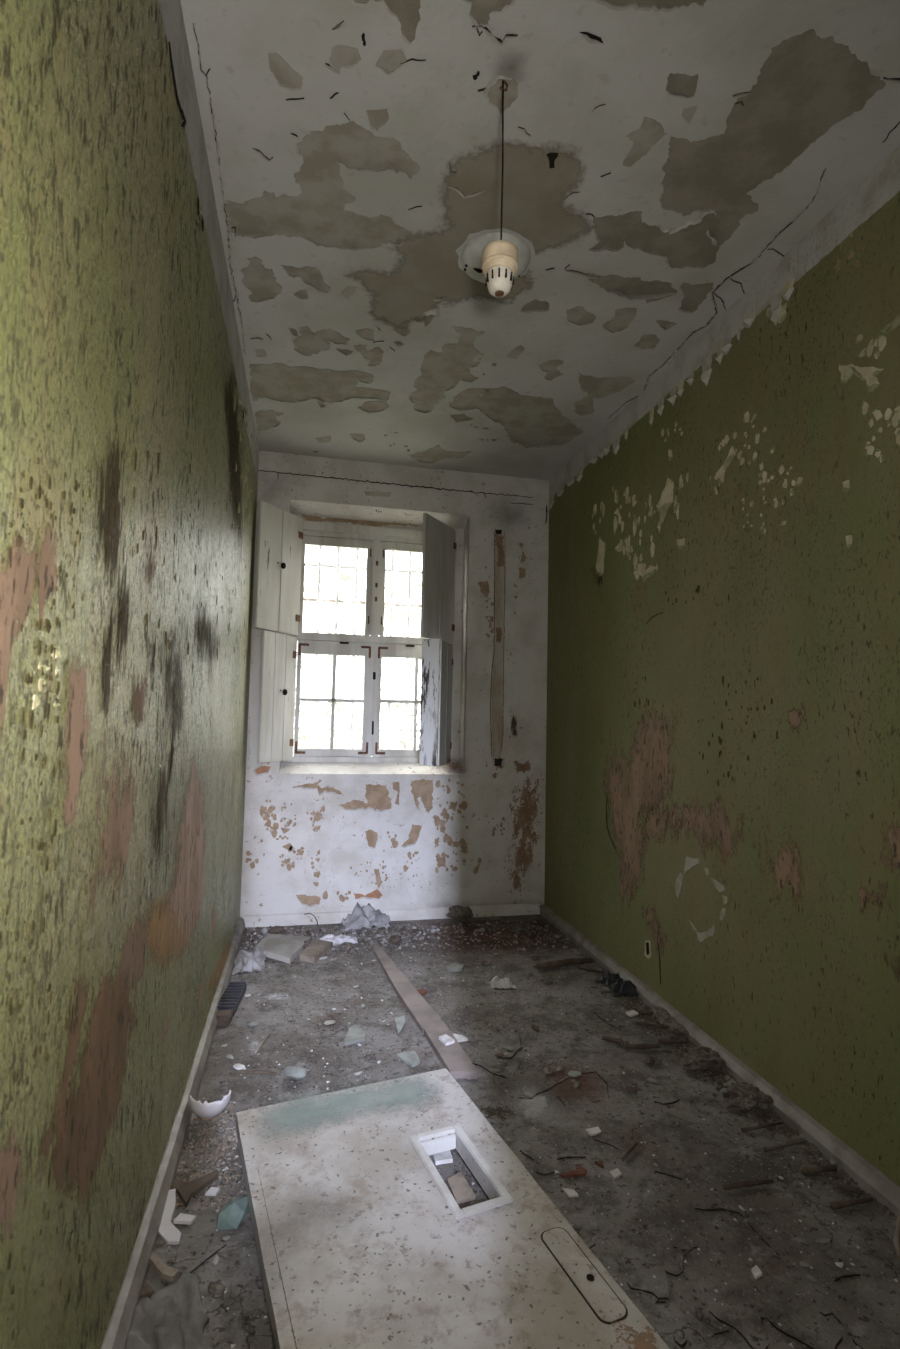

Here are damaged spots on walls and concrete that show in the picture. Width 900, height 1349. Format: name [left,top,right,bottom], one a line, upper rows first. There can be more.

peeling [329,0,420,76]
peeling [473,71,518,115]
crack [883,76,900,84]
peeling [226,108,420,251]
peeling [588,29,886,350]
peeling [241,257,331,302]
crack [608,168,826,419]
peeling [233,297,442,441]
peeling [384,326,634,463]
peeling [592,472,689,582]
peeling [16,457,91,872]
peeling [245,778,481,908]